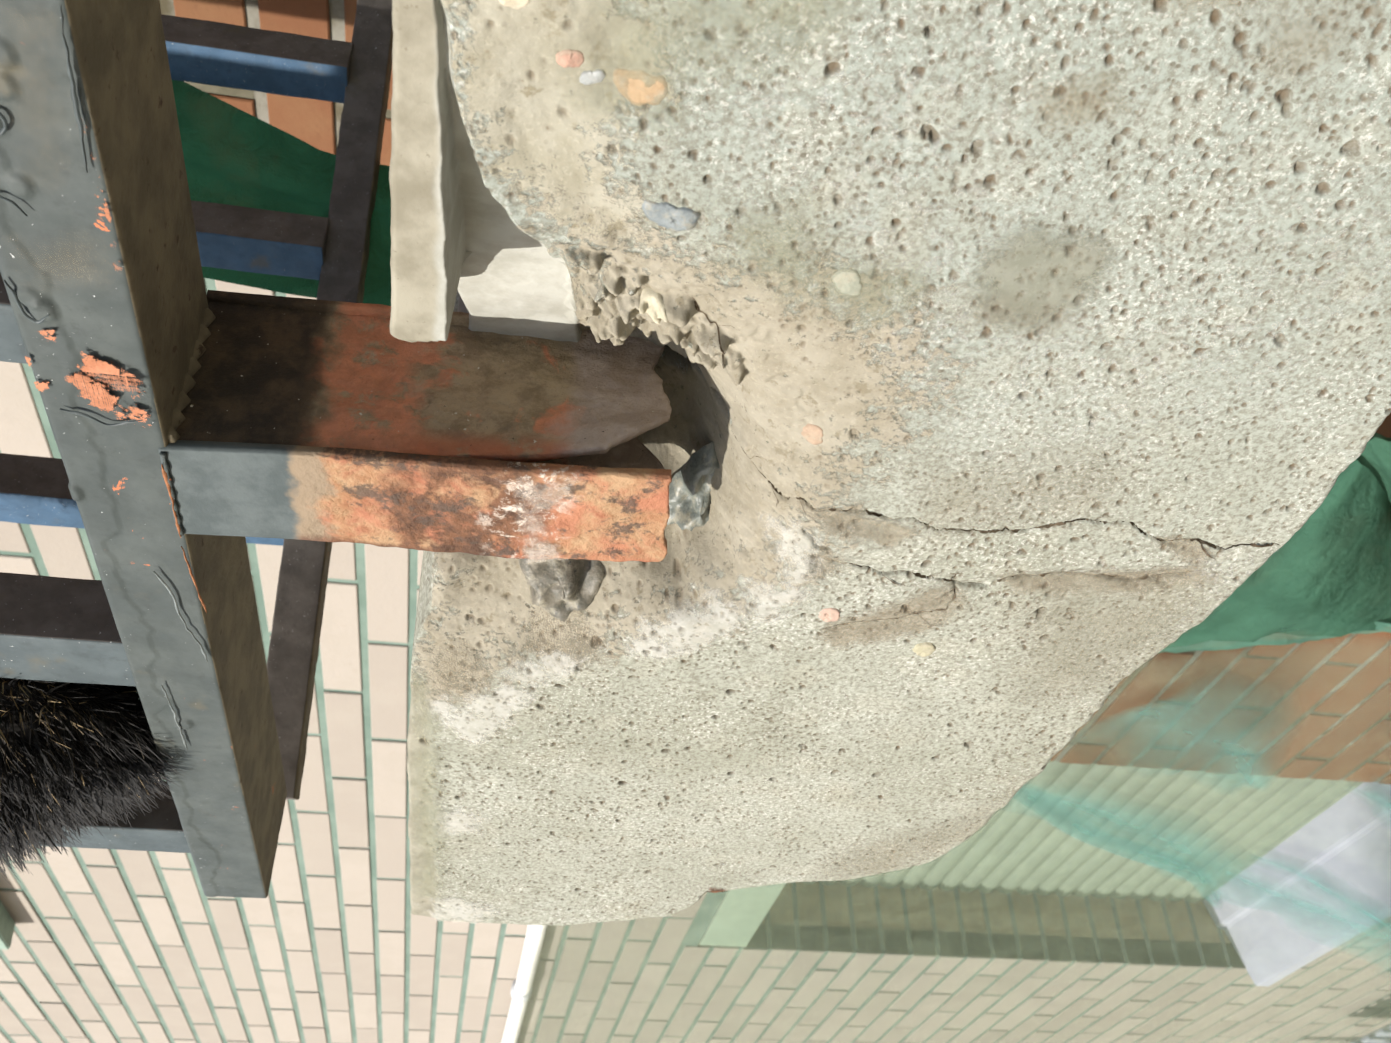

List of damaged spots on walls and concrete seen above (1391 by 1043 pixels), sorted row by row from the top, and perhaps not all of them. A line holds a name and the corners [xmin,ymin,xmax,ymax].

damp [980,232,1108,321]
peeling [25,356,49,393]
peeling [66,351,151,426]
spalling [411,0,974,718]
corrosion [161,464,207,613]
damp [752,529,813,620]
crack [734,435,1279,629]
damp [635,592,737,658]
damp [434,654,574,742]